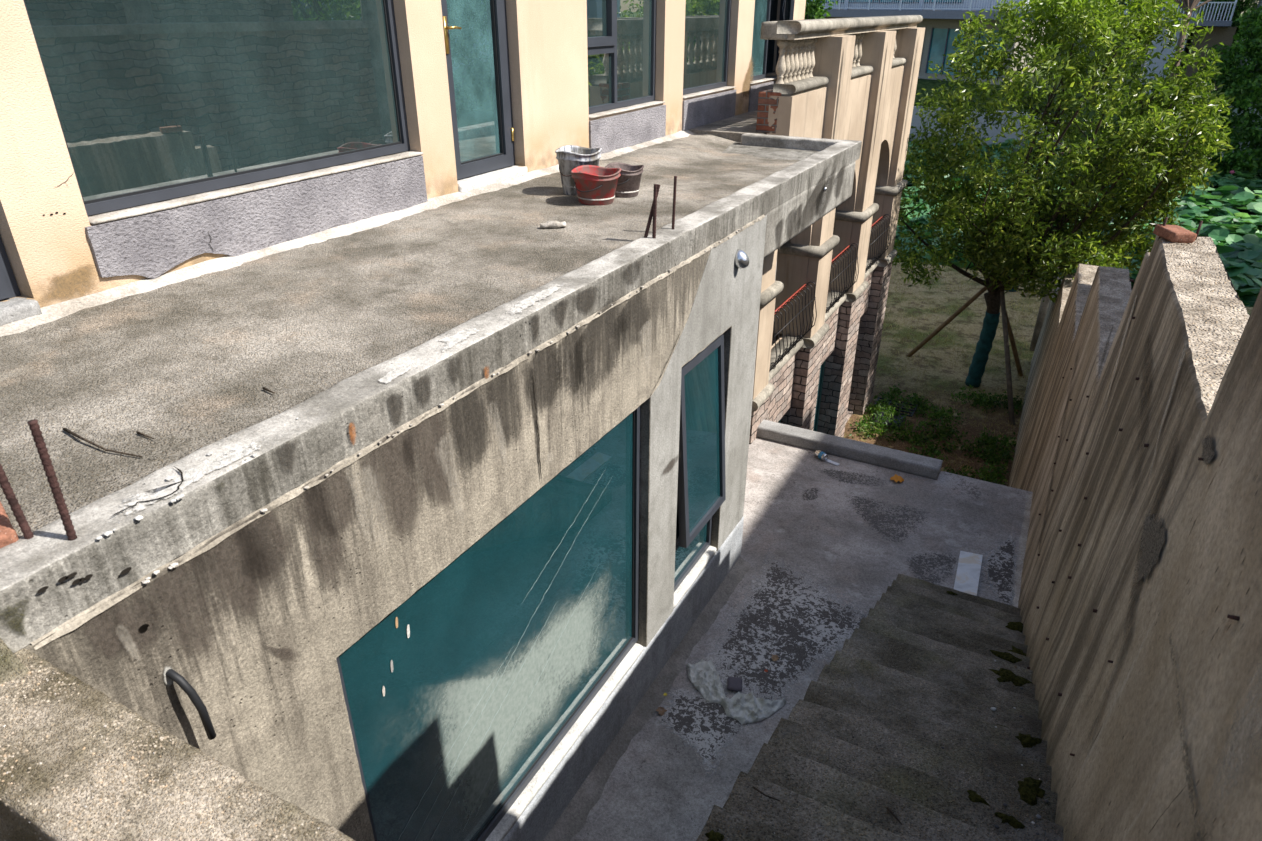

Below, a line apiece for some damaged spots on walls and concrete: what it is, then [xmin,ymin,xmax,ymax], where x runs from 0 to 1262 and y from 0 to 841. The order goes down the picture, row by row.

leakage [278,442,295,469]
spalling [31,214,765,650]
leakage [85,512,288,655]